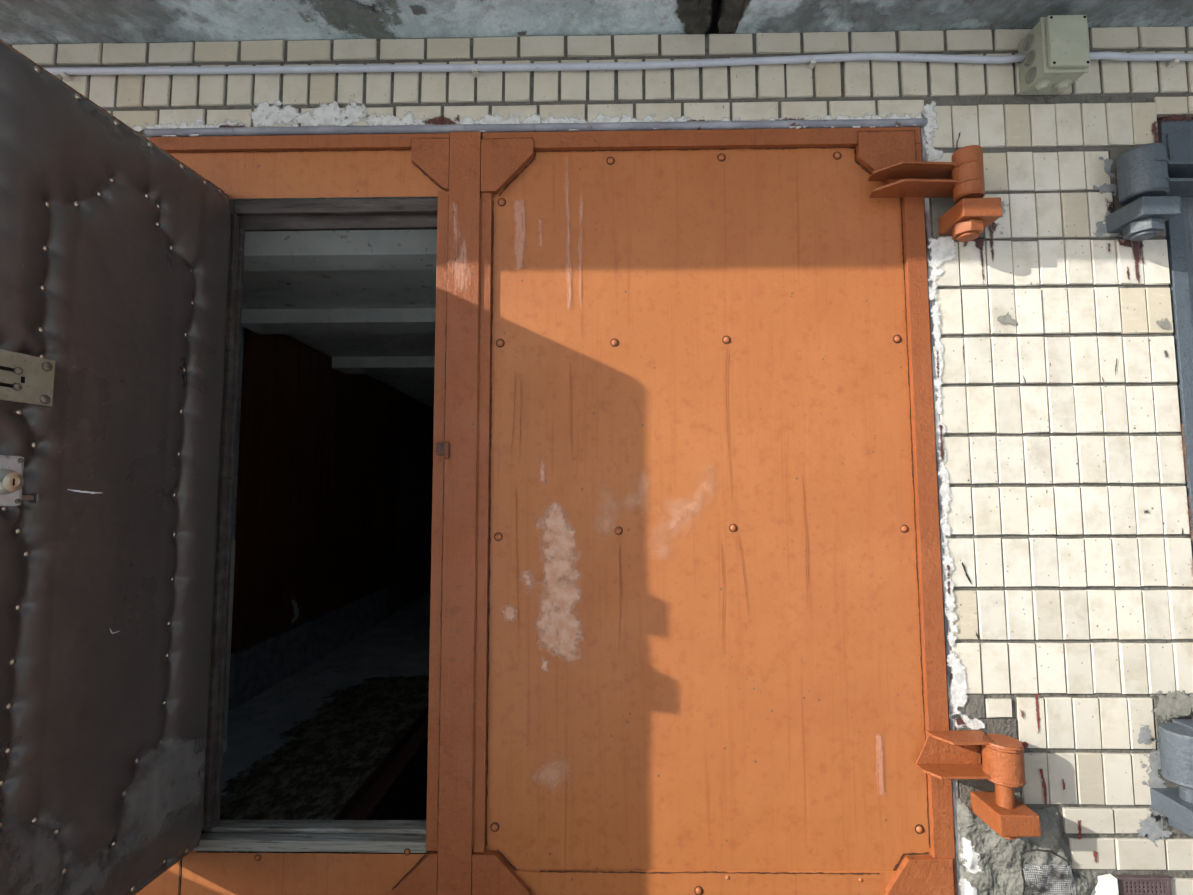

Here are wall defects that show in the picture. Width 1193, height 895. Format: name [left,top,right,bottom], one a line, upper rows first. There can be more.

water stain [0,0,179,44]
water stain [299,0,427,41]
crack [735,0,745,33]
peeling [959,837,982,895]
spalling [1091,874,1119,895]